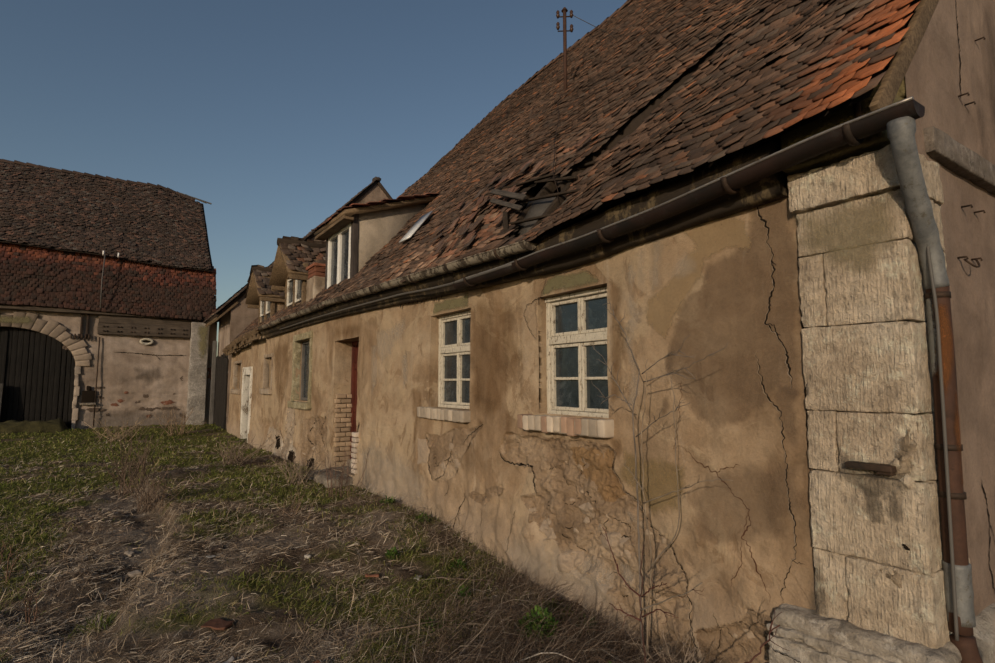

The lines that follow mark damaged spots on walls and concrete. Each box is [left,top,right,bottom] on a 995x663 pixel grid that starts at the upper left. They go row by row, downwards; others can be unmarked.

water stain [647,217,750,337]
corrosion [932,306,953,387]
spalling [263,407,327,470]
spalling [426,424,484,482]
crack [673,207,817,609]
spalling [499,434,773,663]